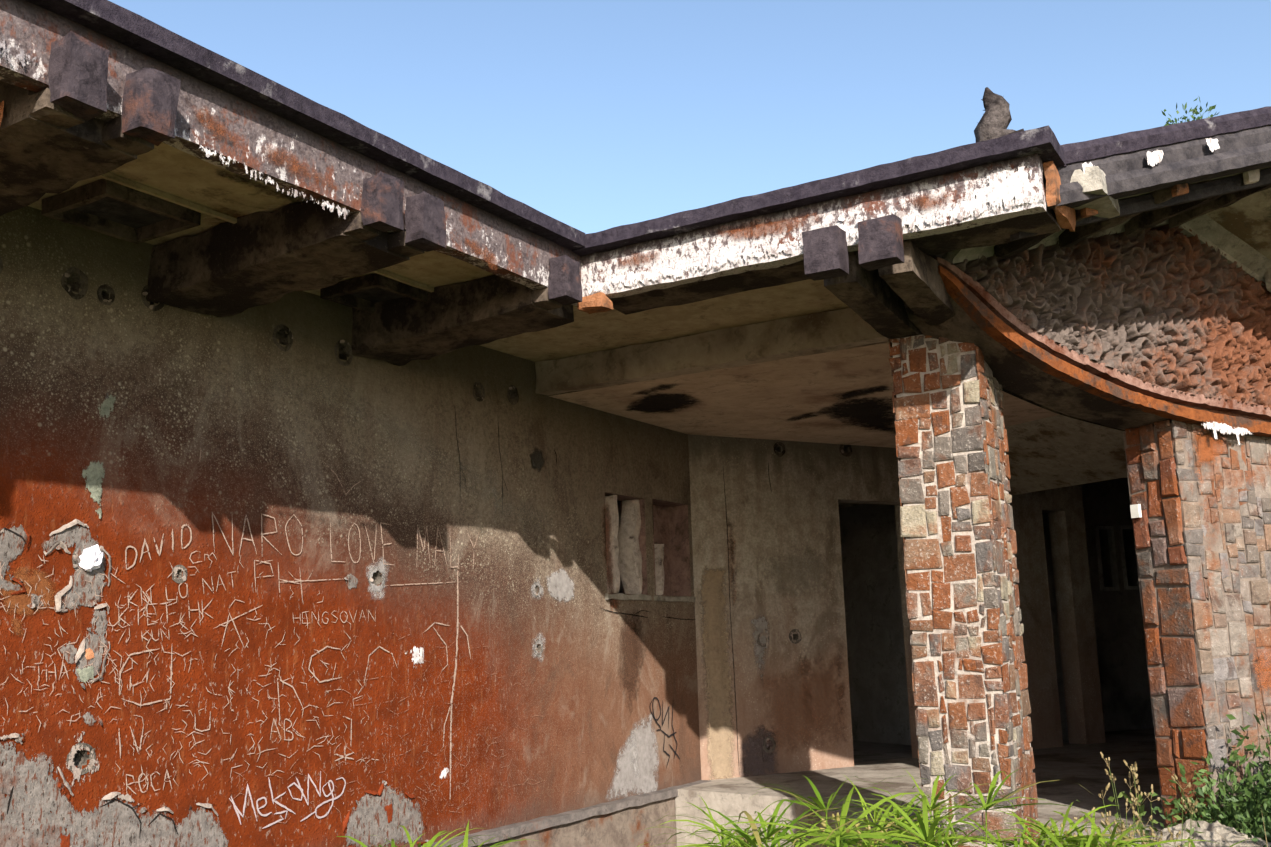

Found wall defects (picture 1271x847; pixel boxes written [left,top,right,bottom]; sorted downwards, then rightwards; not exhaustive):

peeling [0,35,37,67]
corrosion [268,147,304,173]
peeling [886,161,1044,231]
peeling [827,217,862,241]
peeling [584,237,803,297]
damp [626,385,699,413]
damp [790,386,896,433]
corrosion [1,567,56,635]
peeling [0,460,112,689]
spalling [536,569,574,601]
peeling [82,712,103,726]
peeling [0,733,229,847]